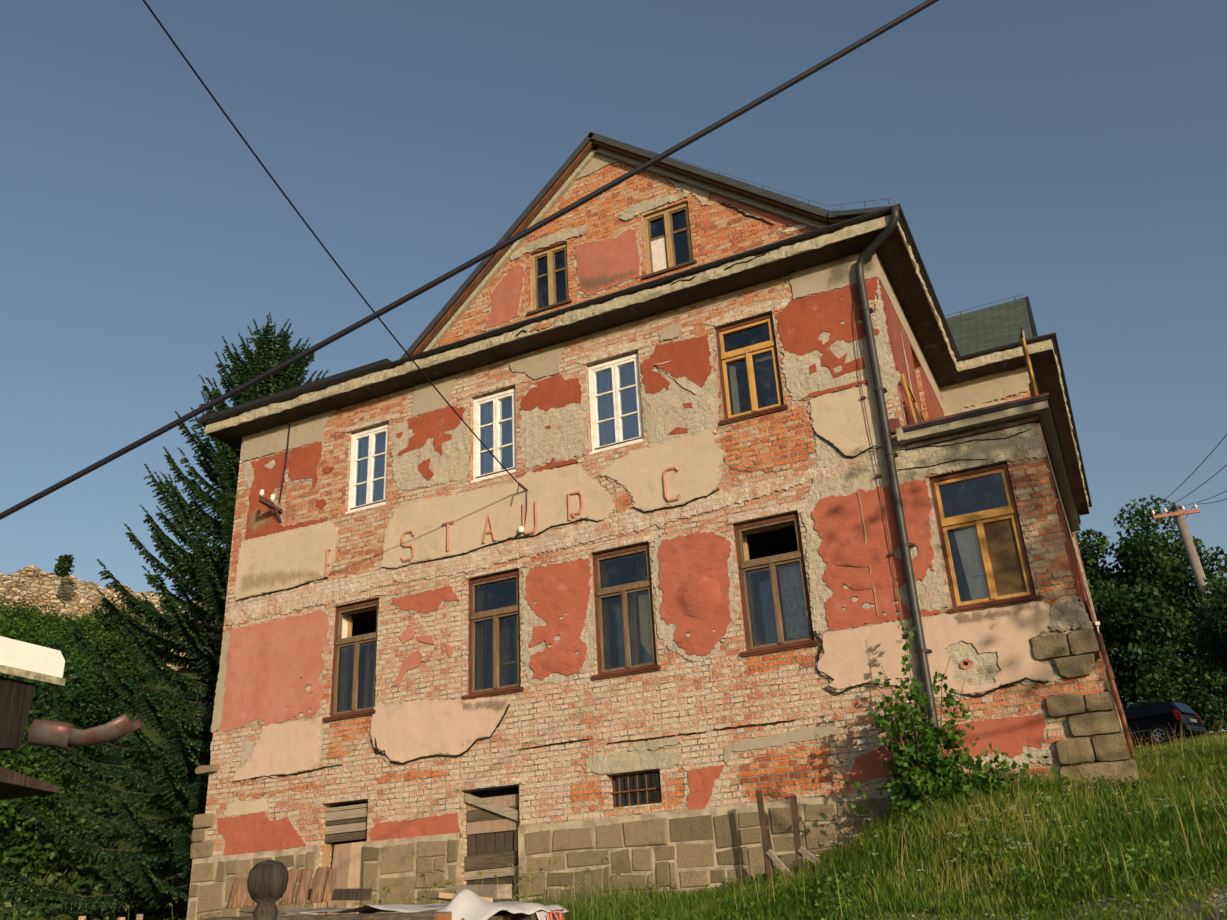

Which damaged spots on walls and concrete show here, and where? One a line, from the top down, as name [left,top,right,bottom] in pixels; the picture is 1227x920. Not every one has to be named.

spalling [437,162,816,348]
spalling [209,277,1106,855]